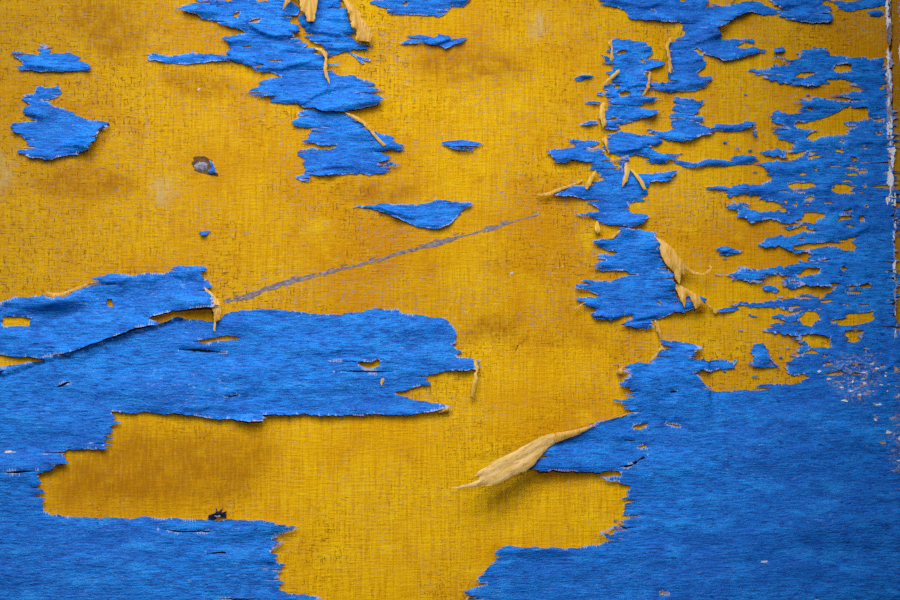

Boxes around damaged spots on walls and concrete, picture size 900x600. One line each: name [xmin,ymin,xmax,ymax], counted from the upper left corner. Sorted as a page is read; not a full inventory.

peeling [369,0,470,17]
peeling [400,34,467,49]
peeling [11,44,92,72]
peeling [147,0,405,181]
peeling [10,86,110,160]
peeling [442,140,483,151]
peeling [537,0,886,335]
peeling [352,199,473,229]
peeling [749,105,900,472]
peeling [3,316,32,327]
crack [50,325,156,356]
peeling [39,342,634,600]